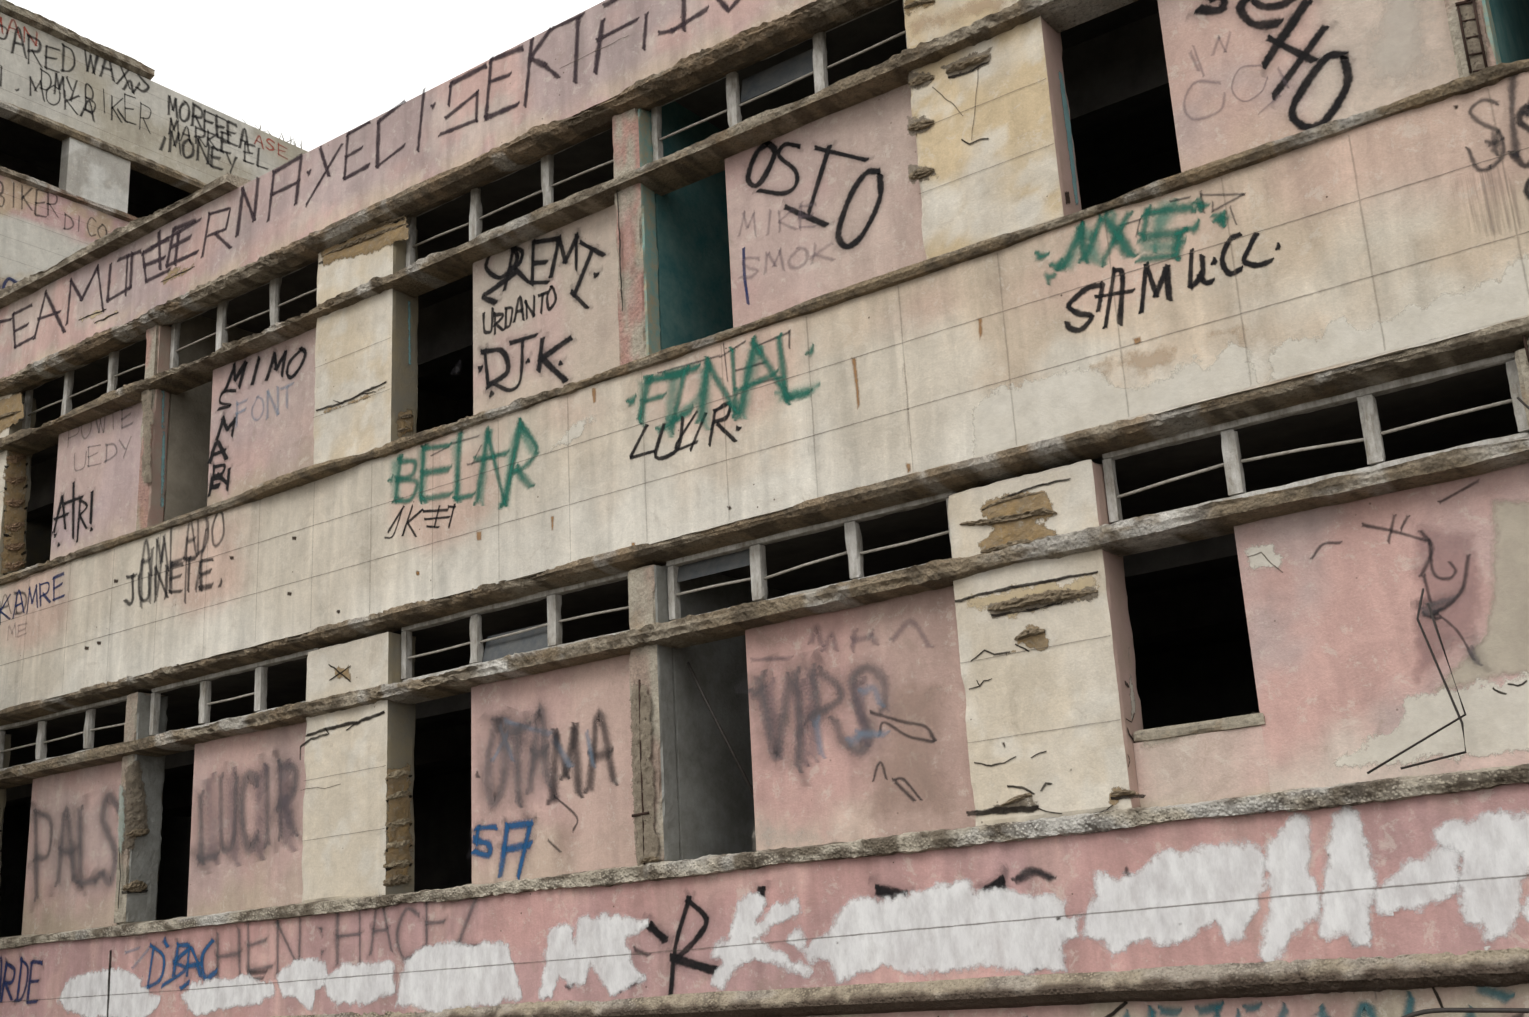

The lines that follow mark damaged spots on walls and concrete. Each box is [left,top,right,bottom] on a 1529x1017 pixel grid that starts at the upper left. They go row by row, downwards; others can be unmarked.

spalling [1455,0,1488,75]
spalling [0,392,25,433]
spalling [0,451,28,575]
spalling [959,478,1071,554]
spalling [955,571,1099,661]
peeling [1334,672,1529,768]
spalling [383,763,414,887]